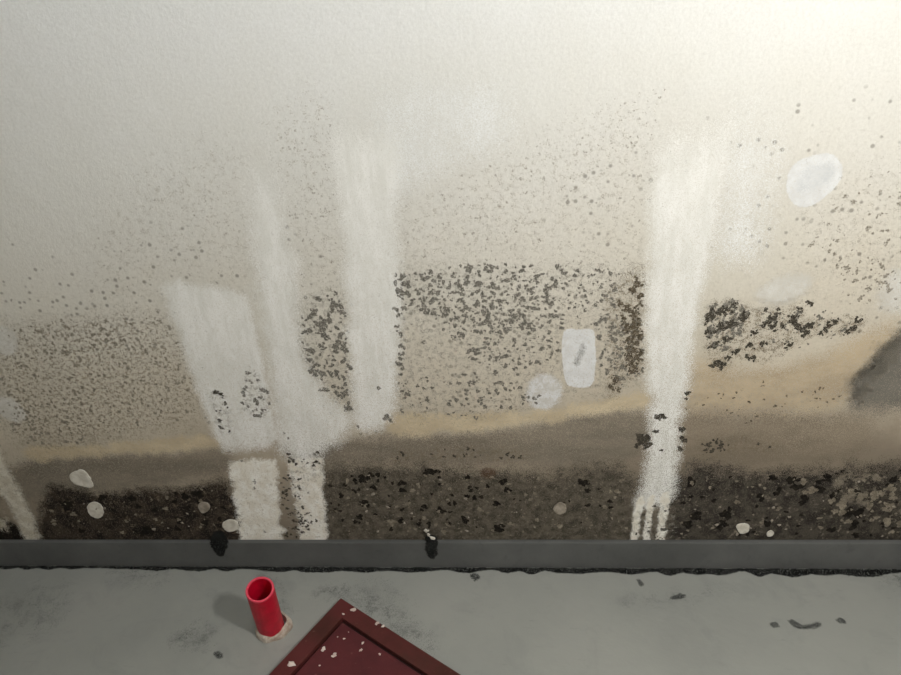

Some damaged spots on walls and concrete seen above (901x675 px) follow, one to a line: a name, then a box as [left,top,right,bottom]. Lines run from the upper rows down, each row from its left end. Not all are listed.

leakage [0,131,271,540]